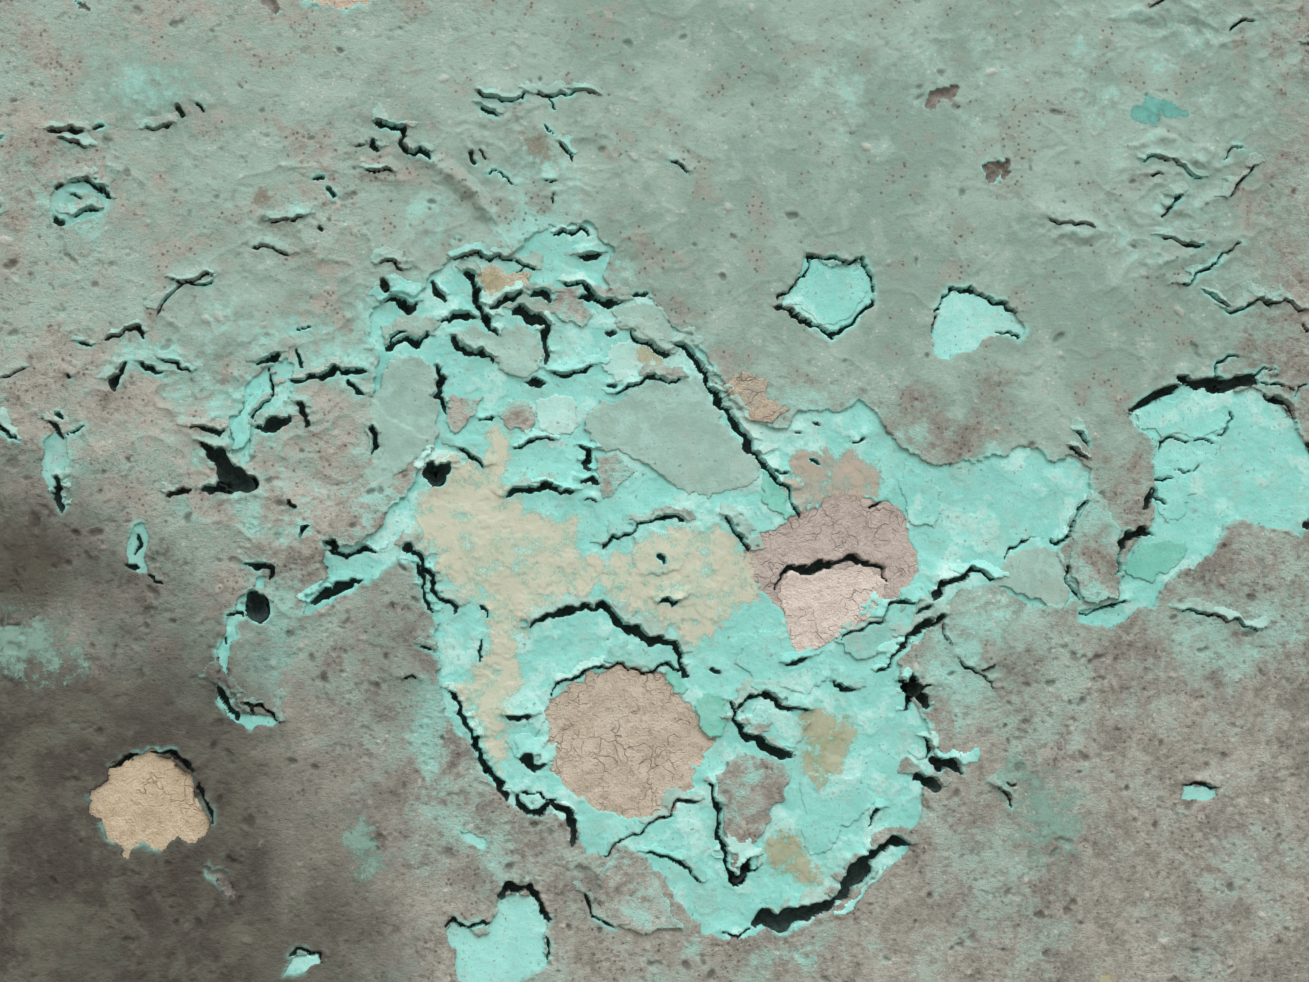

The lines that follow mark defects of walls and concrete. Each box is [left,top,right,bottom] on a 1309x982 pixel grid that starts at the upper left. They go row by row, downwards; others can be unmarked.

flaking render [302,0,371,10]
peeling [160,482,178,493]
peeling [177,221,1309,940]
flaking render [89,748,214,859]
peeling [445,881,552,982]